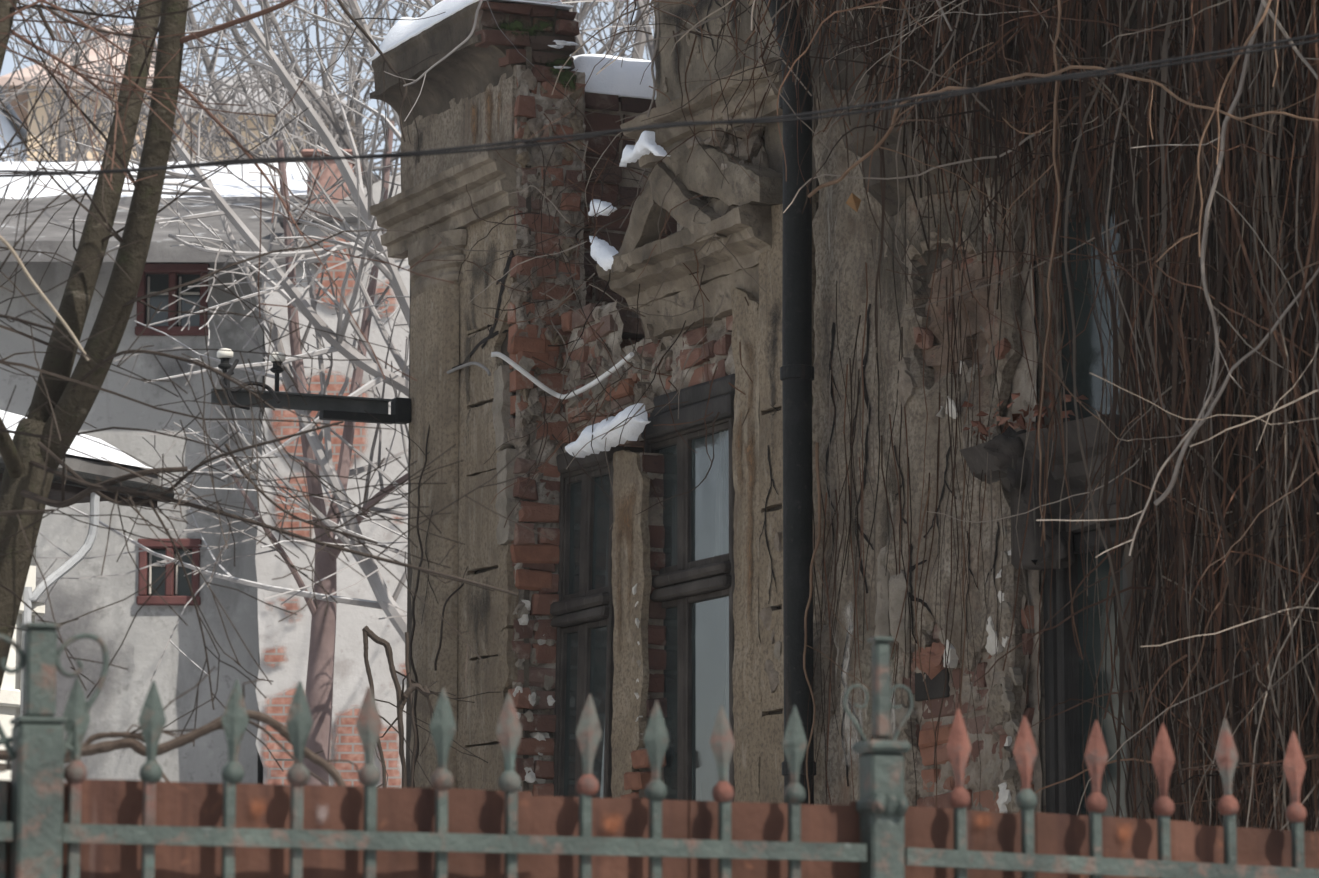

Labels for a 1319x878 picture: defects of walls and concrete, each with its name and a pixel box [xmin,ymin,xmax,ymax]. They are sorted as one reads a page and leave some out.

spalling [507,238,673,448]
spalling [897,233,1011,407]
peeling [936,396,956,419]
flaking render [262,687,297,785]
flaking render [329,706,365,786]
flaking render [379,726,402,787]
spalling [513,591,556,791]
peeling [632,584,641,699]
flaking render [620,739,667,798]
flaking render [896,517,1035,813]